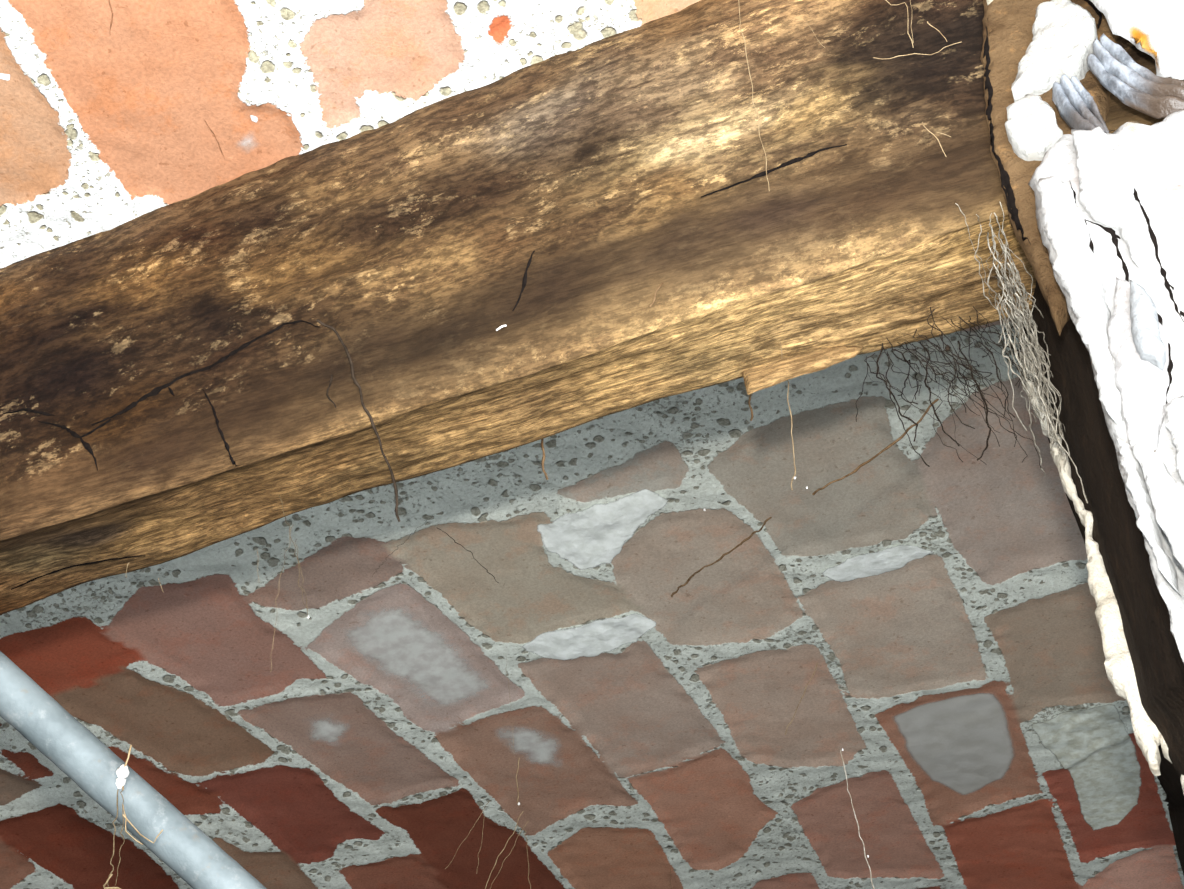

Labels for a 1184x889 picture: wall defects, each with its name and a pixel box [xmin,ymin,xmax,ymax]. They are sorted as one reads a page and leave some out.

crack [1084,0,1102,29]
crack [983,27,1031,245]
crack [1070,182,1129,282]
crack [1133,188,1184,404]
crack [3,320,320,471]
damp [351,610,486,703]